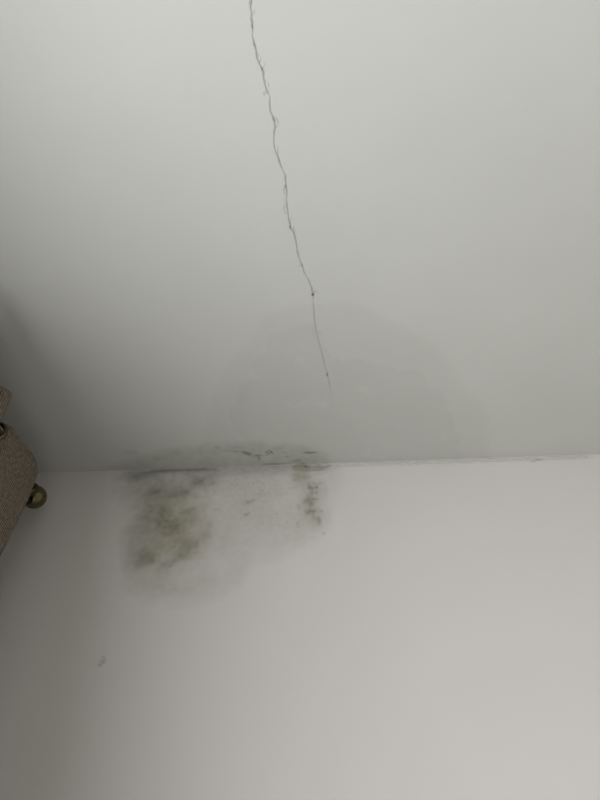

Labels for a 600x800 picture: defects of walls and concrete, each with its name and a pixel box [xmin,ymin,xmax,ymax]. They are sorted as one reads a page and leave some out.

crack [249,0,331,391]